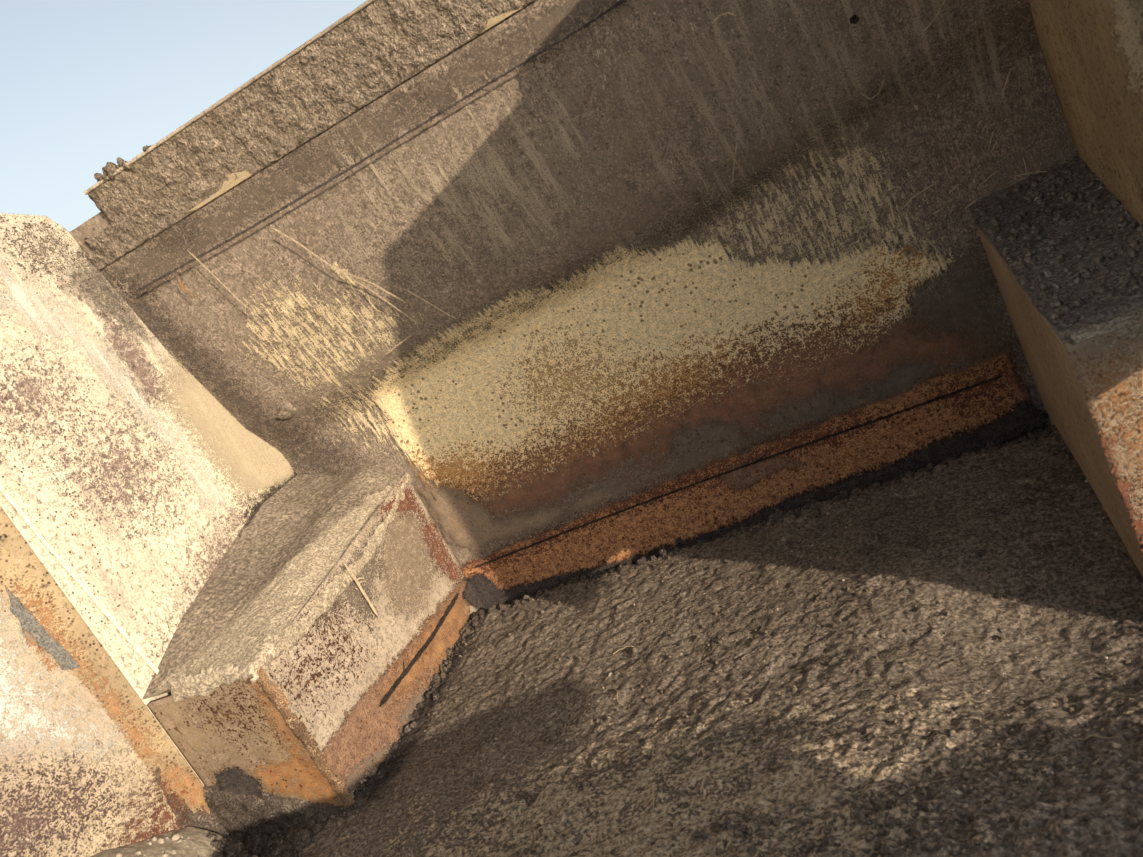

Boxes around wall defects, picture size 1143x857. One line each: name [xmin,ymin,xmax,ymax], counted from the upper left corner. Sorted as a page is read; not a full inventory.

rust [172,244,1031,807]
crack [474,376,1002,568]
rust [1075,347,1143,553]
rust [0,574,212,857]
crack [379,593,459,707]